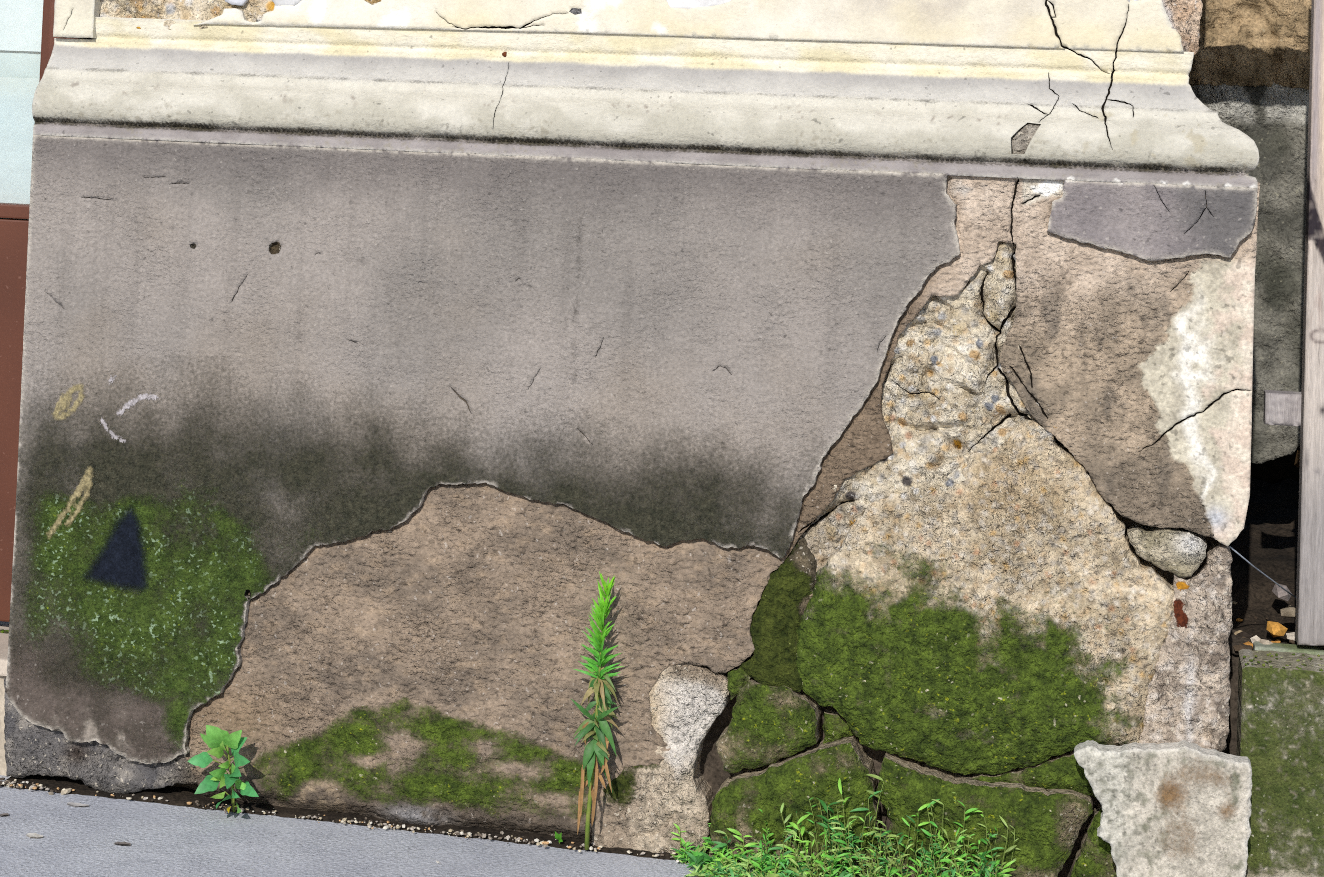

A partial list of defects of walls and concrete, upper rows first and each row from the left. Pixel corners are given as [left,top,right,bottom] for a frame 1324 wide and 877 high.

spalling [99,0,302,30]
crack [1028,0,1134,150]
spalling [1162,0,1203,55]
crack [968,178,1048,452]
crack [1139,389,1255,452]
leakage [9,405,801,691]
spalling [4,175,1260,877]
crack [807,500,849,529]